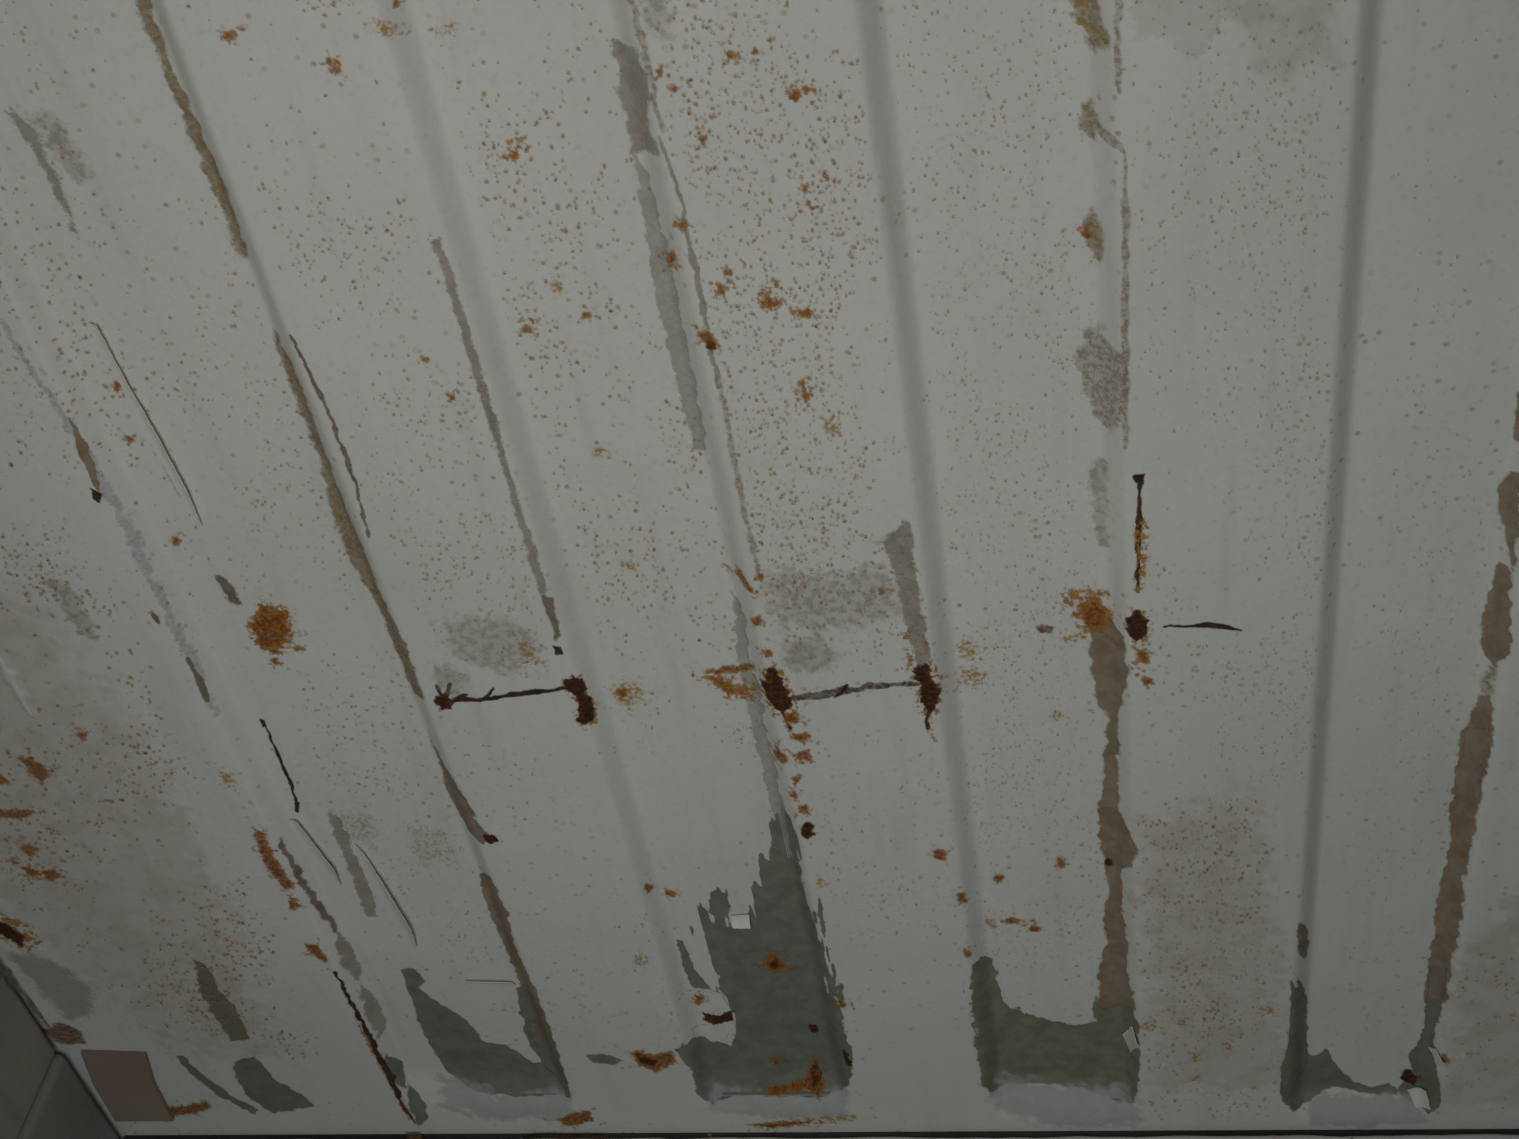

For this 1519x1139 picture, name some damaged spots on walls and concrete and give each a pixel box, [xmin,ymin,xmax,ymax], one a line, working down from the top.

peeling [138,0,248,256]
peeling [612,40,719,450]
corrosion [0,519,131,632]
corrosion [0,672,188,953]
corrosion [103,878,318,1060]
corrosion [246,595,306,670]
peeling [275,333,424,698]
peeling [278,814,571,1125]
peeling [675,596,853,1117]
corrosion [460,0,1117,966]
peeling [963,618,1140,1126]
peeling [1280,472,1519,1128]